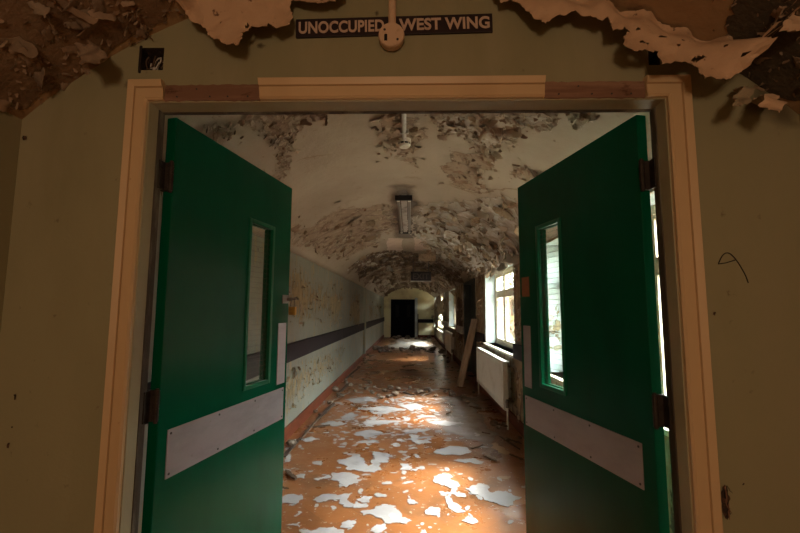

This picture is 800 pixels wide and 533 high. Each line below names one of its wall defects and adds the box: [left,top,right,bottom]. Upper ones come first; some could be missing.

peeling [0,0,336,113]
peeling [500,0,800,113]
peeling [202,114,328,181]
peeling [291,113,600,351]